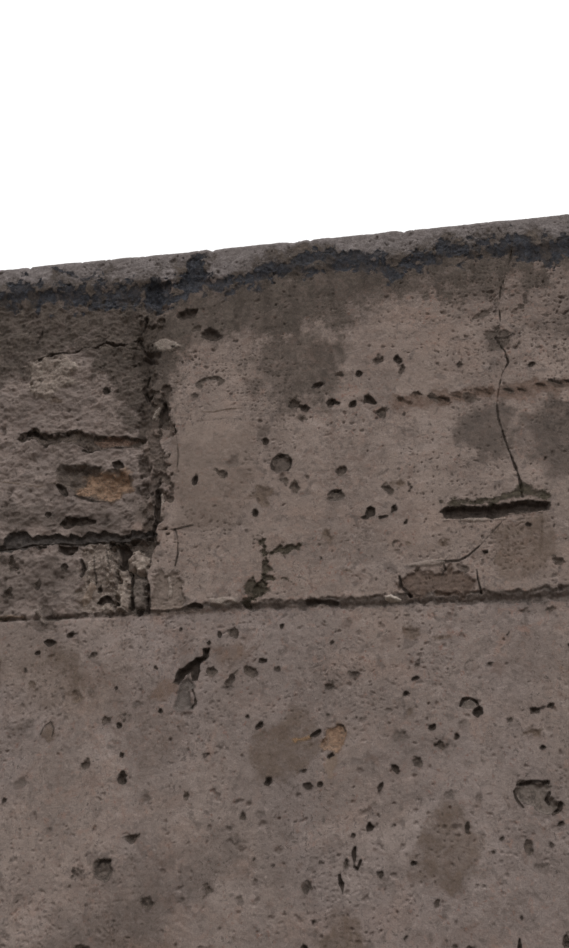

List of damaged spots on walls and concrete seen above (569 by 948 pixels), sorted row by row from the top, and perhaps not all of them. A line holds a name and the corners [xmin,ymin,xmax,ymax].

spalling [177,308,198,320]
water stain [0,225,569,432]
crack [475,241,530,498]
spalling [19,317,178,617]
water stain [454,396,569,476]
spalling [440,482,551,526]
crack [0,525,193,566]
crack [435,523,501,595]
spalling [174,627,239,711]
spalling [223,658,280,689]
spalling [513,780,565,826]